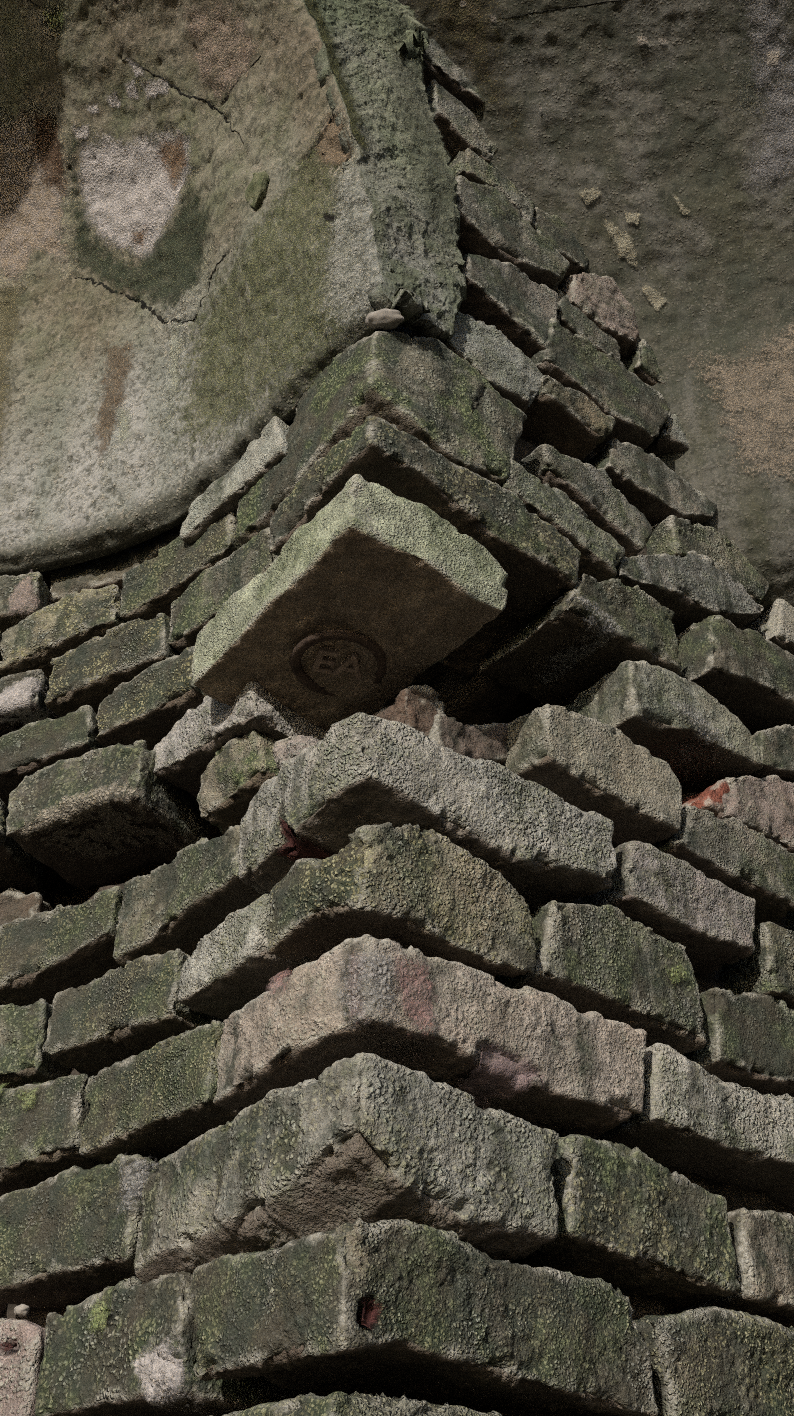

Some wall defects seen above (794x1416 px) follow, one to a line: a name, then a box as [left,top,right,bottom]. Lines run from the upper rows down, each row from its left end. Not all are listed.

crack [121,56,260,143]
crack [75,249,234,324]